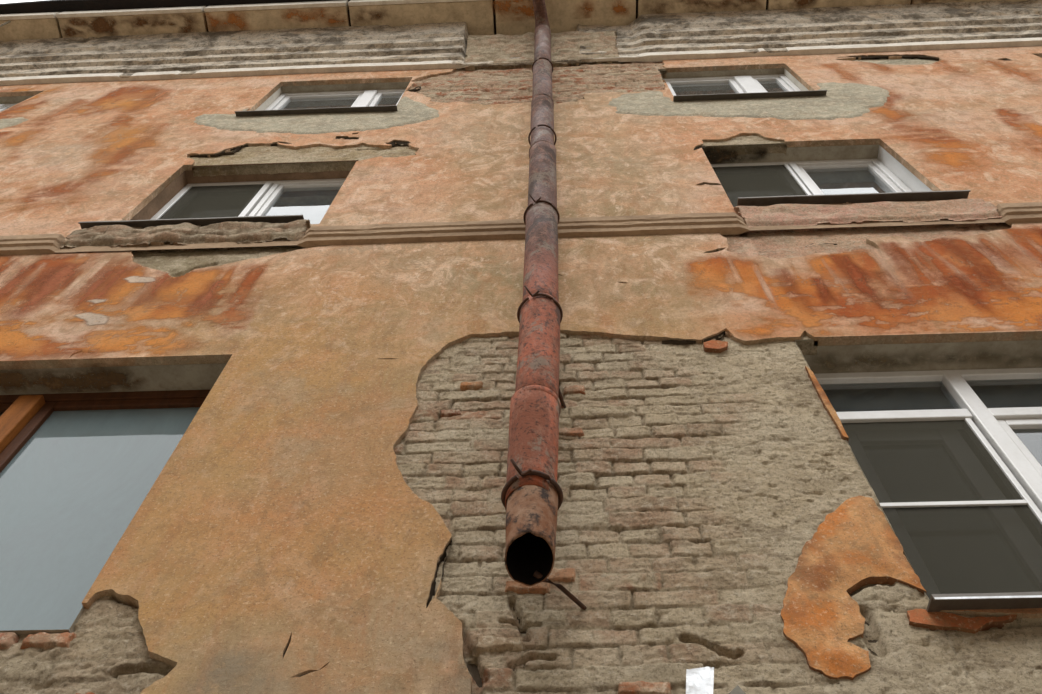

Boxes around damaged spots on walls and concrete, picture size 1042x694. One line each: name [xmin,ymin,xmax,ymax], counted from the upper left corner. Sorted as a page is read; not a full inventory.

flaking render [409,67,533,105]
flaking render [552,62,667,104]
corrosion [0,253,266,359]
flaking render [125,246,305,283]
corrosion [689,226,1042,336]
flaking render [394,332,1042,694]
flaking render [0,596,173,694]